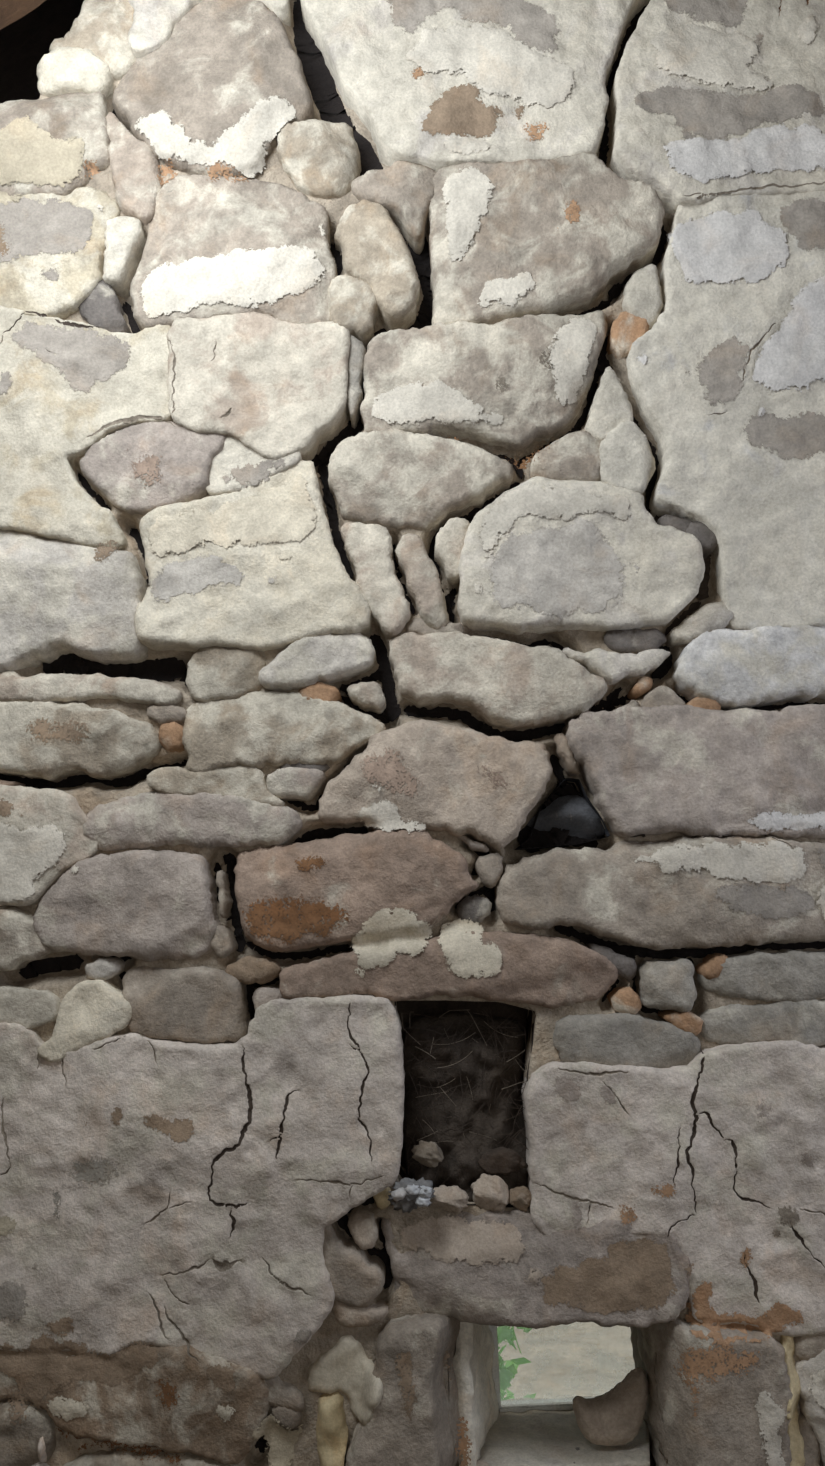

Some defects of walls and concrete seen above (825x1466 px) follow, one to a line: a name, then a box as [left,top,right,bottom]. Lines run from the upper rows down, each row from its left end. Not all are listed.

crack [558,1068,629,1115]
crack [668,1050,825,1266]
crack [146,1004,382,1361]
crack [538,1184,613,1221]
crack [744,1255,760,1303]